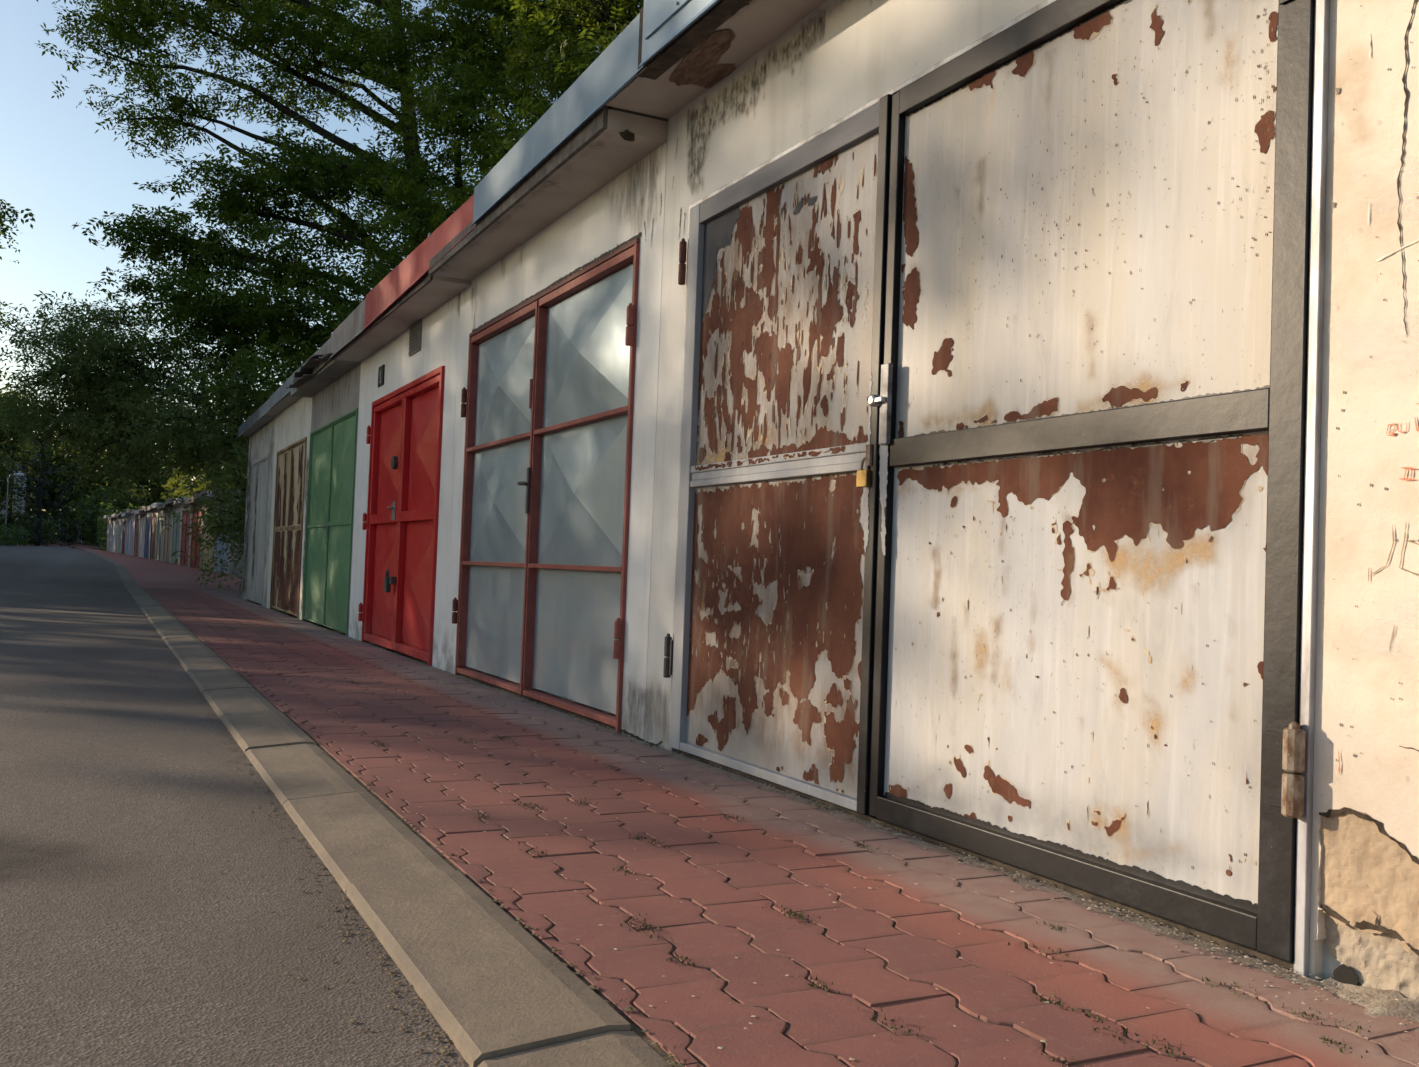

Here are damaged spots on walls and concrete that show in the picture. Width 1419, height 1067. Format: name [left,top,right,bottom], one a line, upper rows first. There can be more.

damp [621,16,824,240]
corrosion [695,154,877,471]
corrosion [901,156,921,330]
corrosion [931,338,954,377]
corrosion [1101,382,1157,408]
corrosion [1082,4,1179,146]
corrosion [1231,8,1278,261]
crack [1397,0,1417,334]
corrosion [897,434,1269,605]
corrosion [687,473,866,793]
corrosion [919,697,1041,822]
flaking render [1320,809,1419,1001]